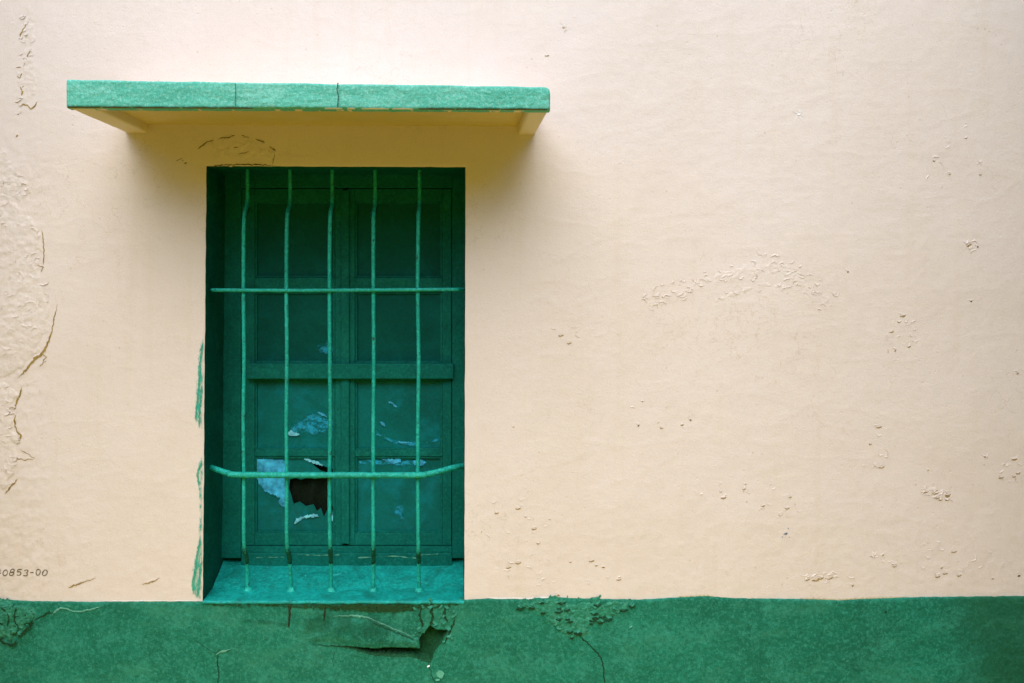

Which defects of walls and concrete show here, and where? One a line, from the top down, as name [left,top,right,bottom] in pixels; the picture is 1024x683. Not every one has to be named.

crack [16,24,37,109]
flaking render [492,499,639,639]
flaking render [344,598,457,681]